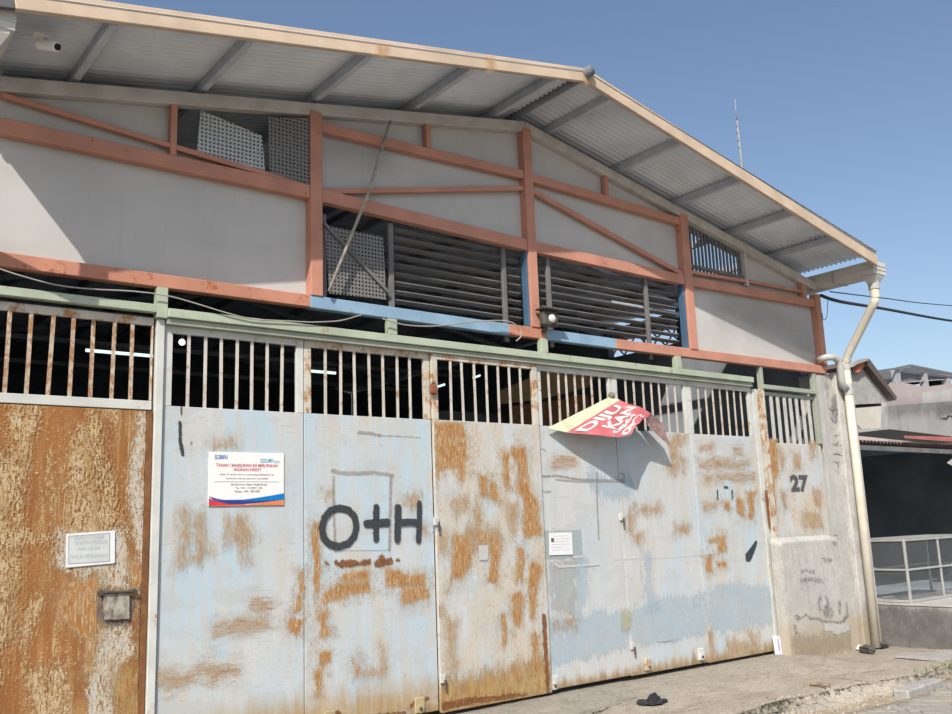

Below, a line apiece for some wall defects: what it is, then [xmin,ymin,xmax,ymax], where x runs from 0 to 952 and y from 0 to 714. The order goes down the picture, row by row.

rust [667,433,687,477]
rust [173,507,210,570]
rust [222,511,252,565]
rust [285,420,578,712]
rust [625,501,665,543]
rust [704,534,727,574]
rust [698,439,818,529]
rust [799,486,824,531]
rust [57,575,102,676]
rust [211,597,275,639]
rust [110,661,139,714]
rust [155,659,242,692]